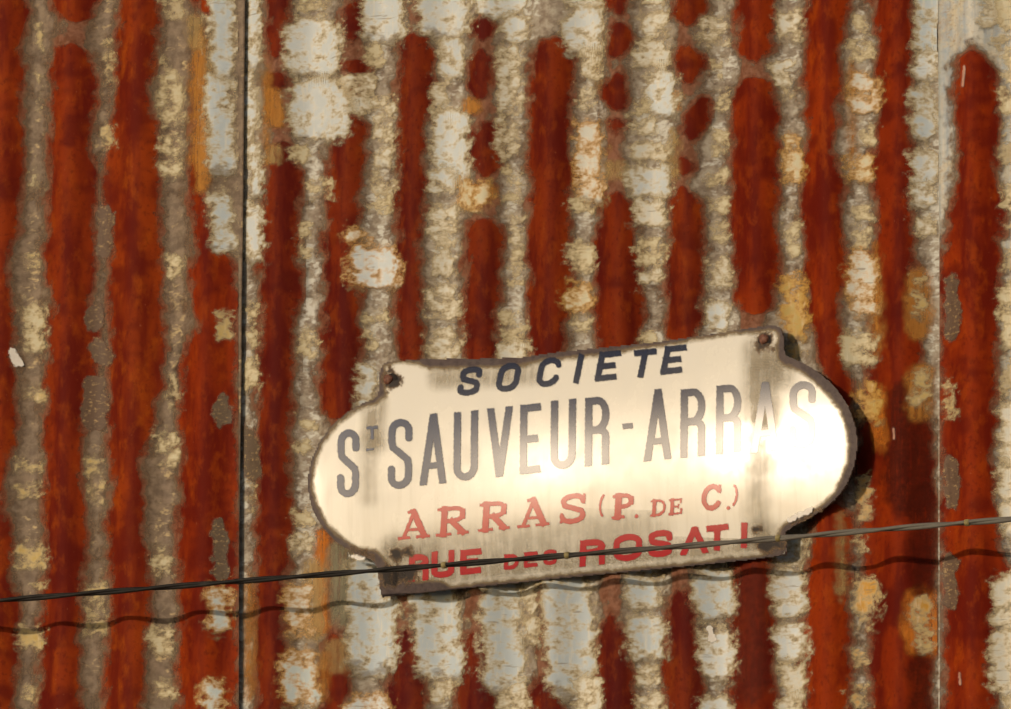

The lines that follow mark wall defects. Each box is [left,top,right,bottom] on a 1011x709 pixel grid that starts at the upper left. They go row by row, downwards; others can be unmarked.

corrosion [0,0,442,709]
peeling [280,0,532,360]
peeling [560,0,611,215]
peeling [623,0,682,284]
corrosion [455,0,1011,709]
peeling [839,205,881,368]
peeling [904,0,938,238]
peeling [276,583,323,709]
peeling [342,554,604,709]
corrosion [447,587,499,709]
peeling [690,562,739,709]
peeling [767,533,813,709]